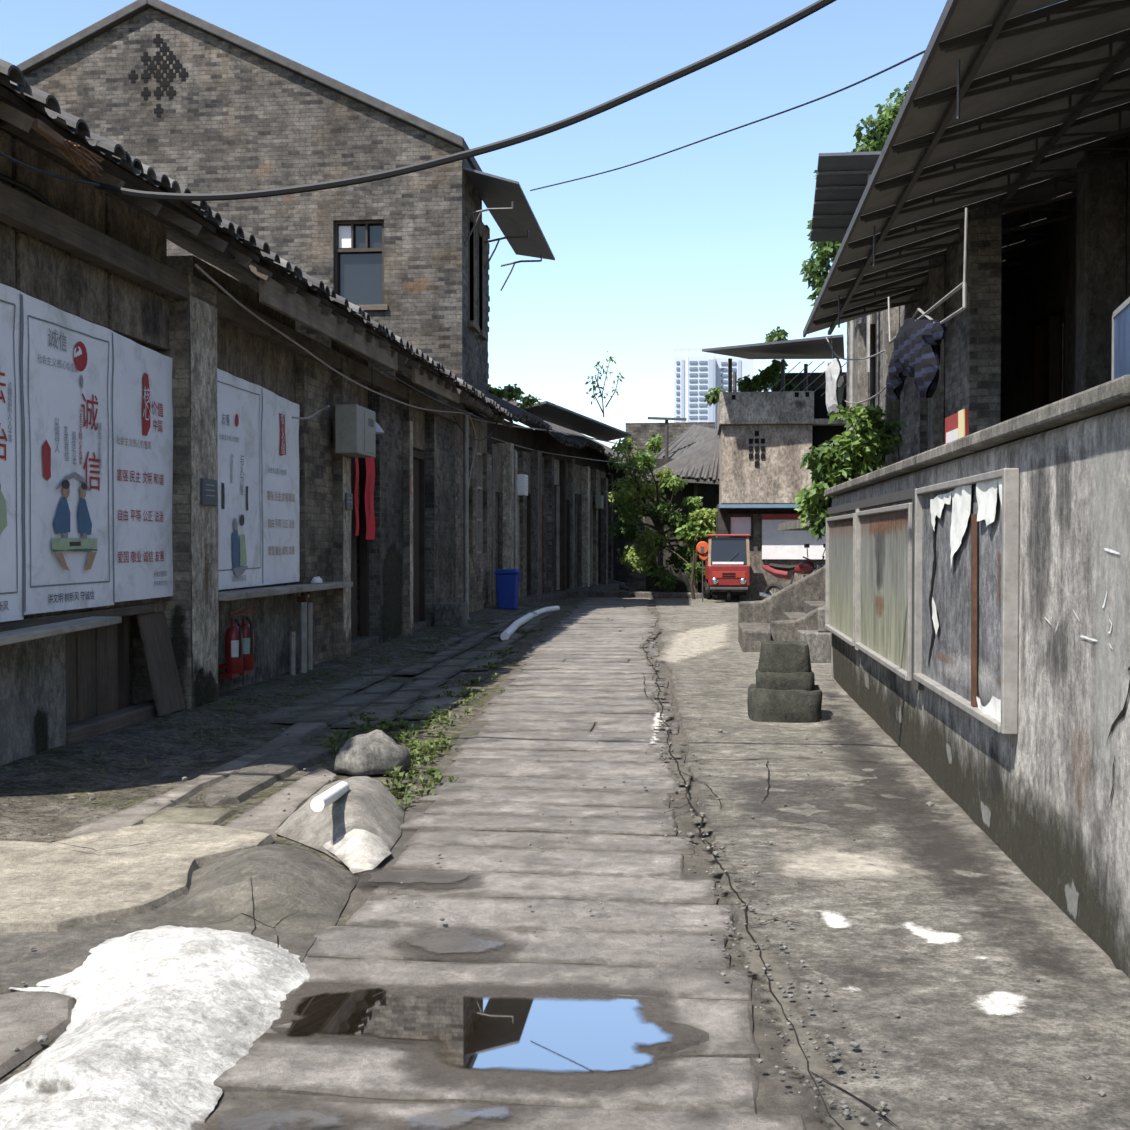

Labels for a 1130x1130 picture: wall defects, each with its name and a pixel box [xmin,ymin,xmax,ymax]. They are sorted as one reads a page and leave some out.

water stain [1029,453,1070,615]
crack [638,629,900,1130]
water stain [742,633,1130,982]
crack [1105,667,1130,803]